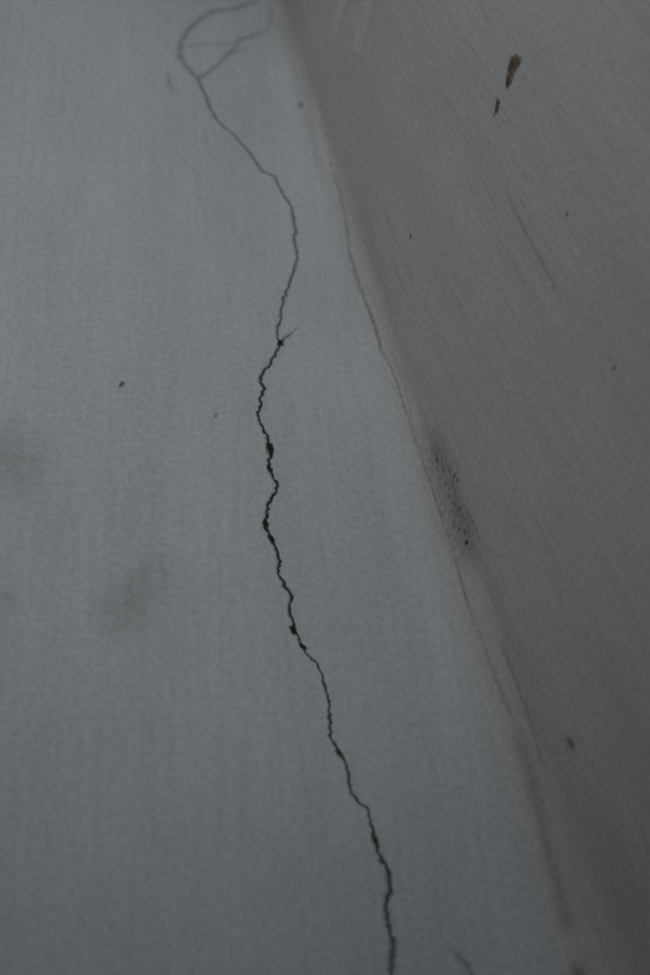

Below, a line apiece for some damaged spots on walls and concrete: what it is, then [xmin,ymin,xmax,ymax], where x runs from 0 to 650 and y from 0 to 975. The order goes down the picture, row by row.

crack [253,188,395,975]